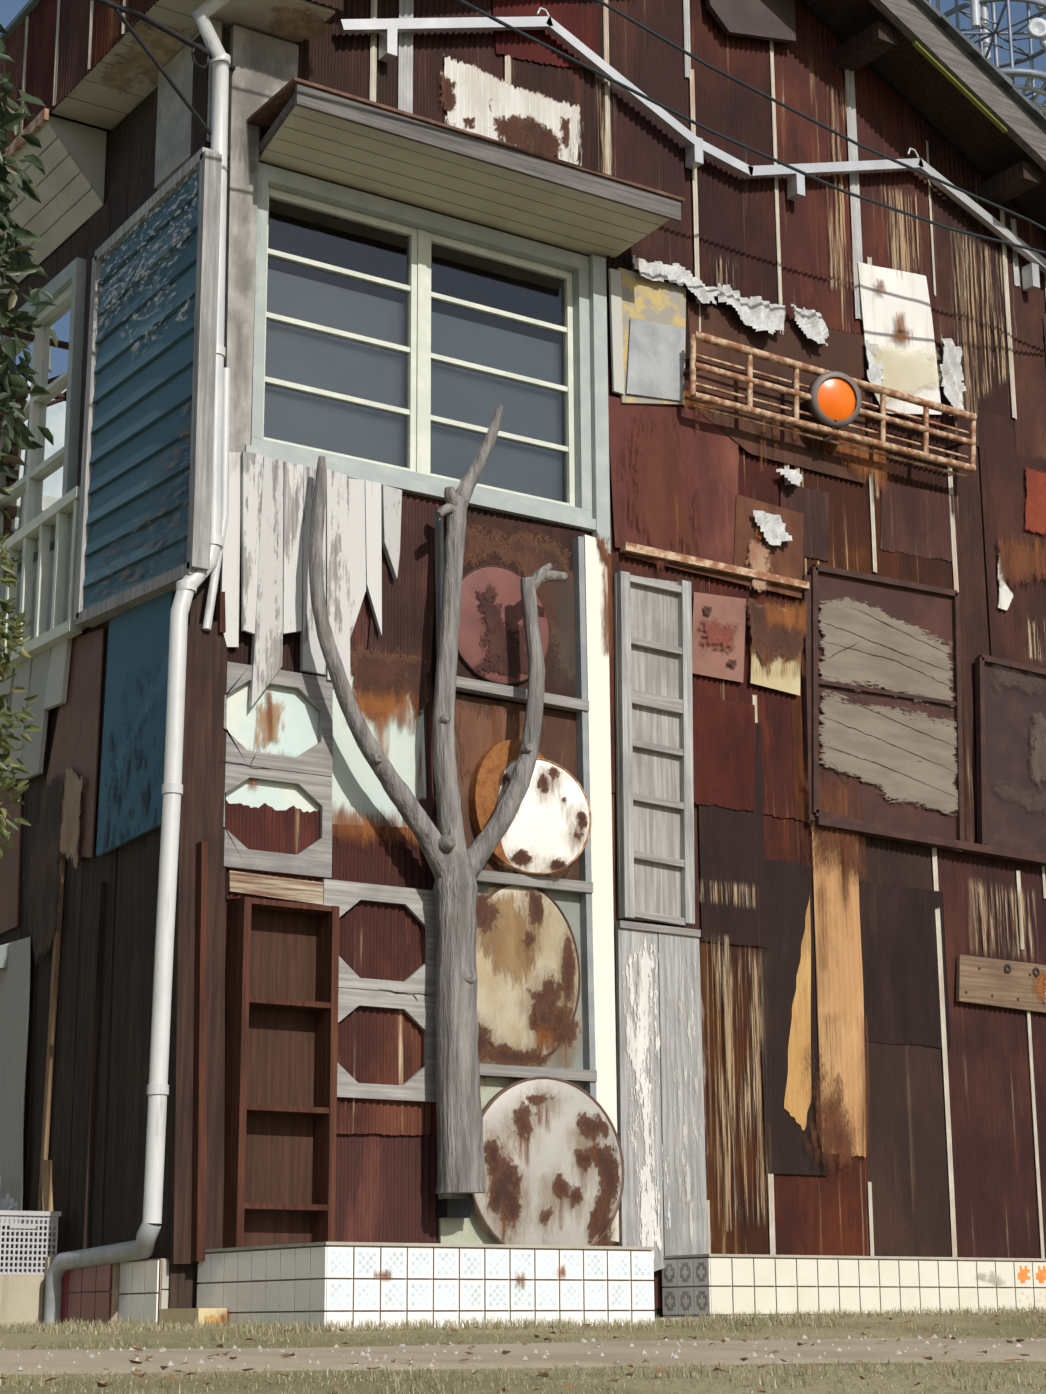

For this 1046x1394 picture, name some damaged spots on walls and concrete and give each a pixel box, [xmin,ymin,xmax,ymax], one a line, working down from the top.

peeling [438,54,582,166]
peeling [93,164,200,356]
peeling [91,402,192,598]
corrosion [596,302,886,674]
corrosion [998,466,1046,588]
corrosion [510,849,533,865]
corrosion [538,766,588,840]
corrosion [476,889,579,1080]
corrosion [484,1094,553,1241]
corrosion [540,1112,622,1246]
peeling [622,937,704,1259]
corrosion [711,937,765,1228]